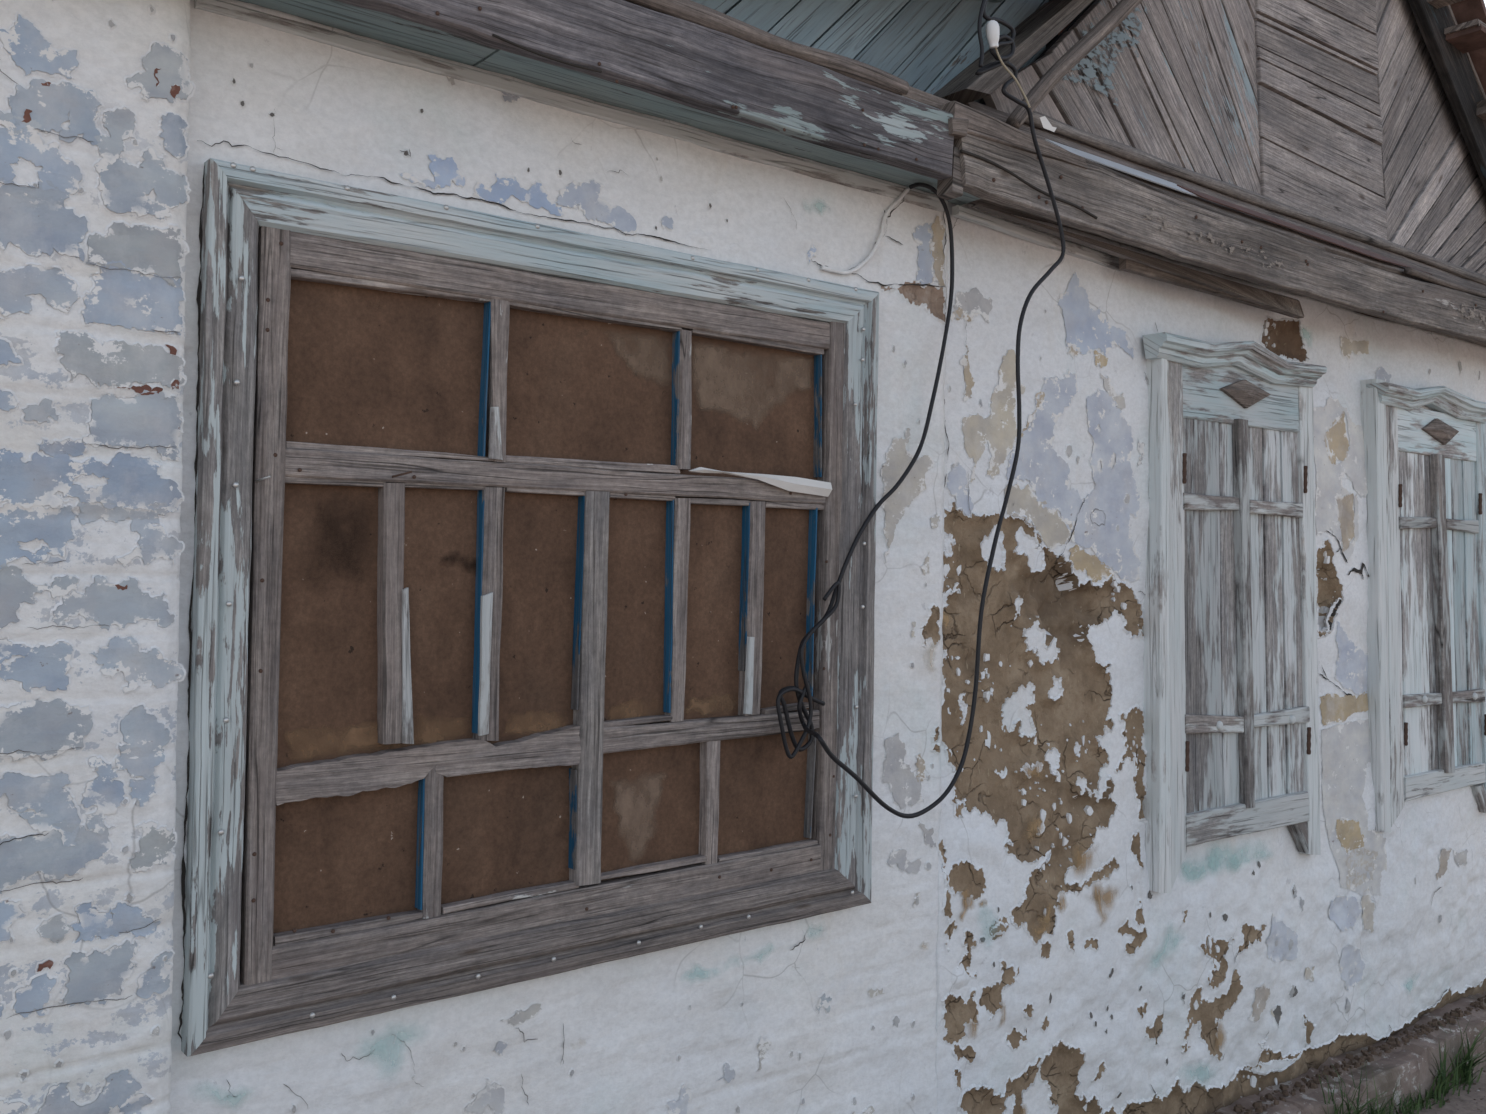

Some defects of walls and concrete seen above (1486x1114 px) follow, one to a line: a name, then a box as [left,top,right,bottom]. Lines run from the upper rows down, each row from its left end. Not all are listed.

spalling [879,214,993,325]
spalling [1260,315,1309,363]
flaking render [1339,335,1369,361]
crack [90,109,703,1041]
spalling [879,343,1486,1114]
peeling [0,1058,155,1114]